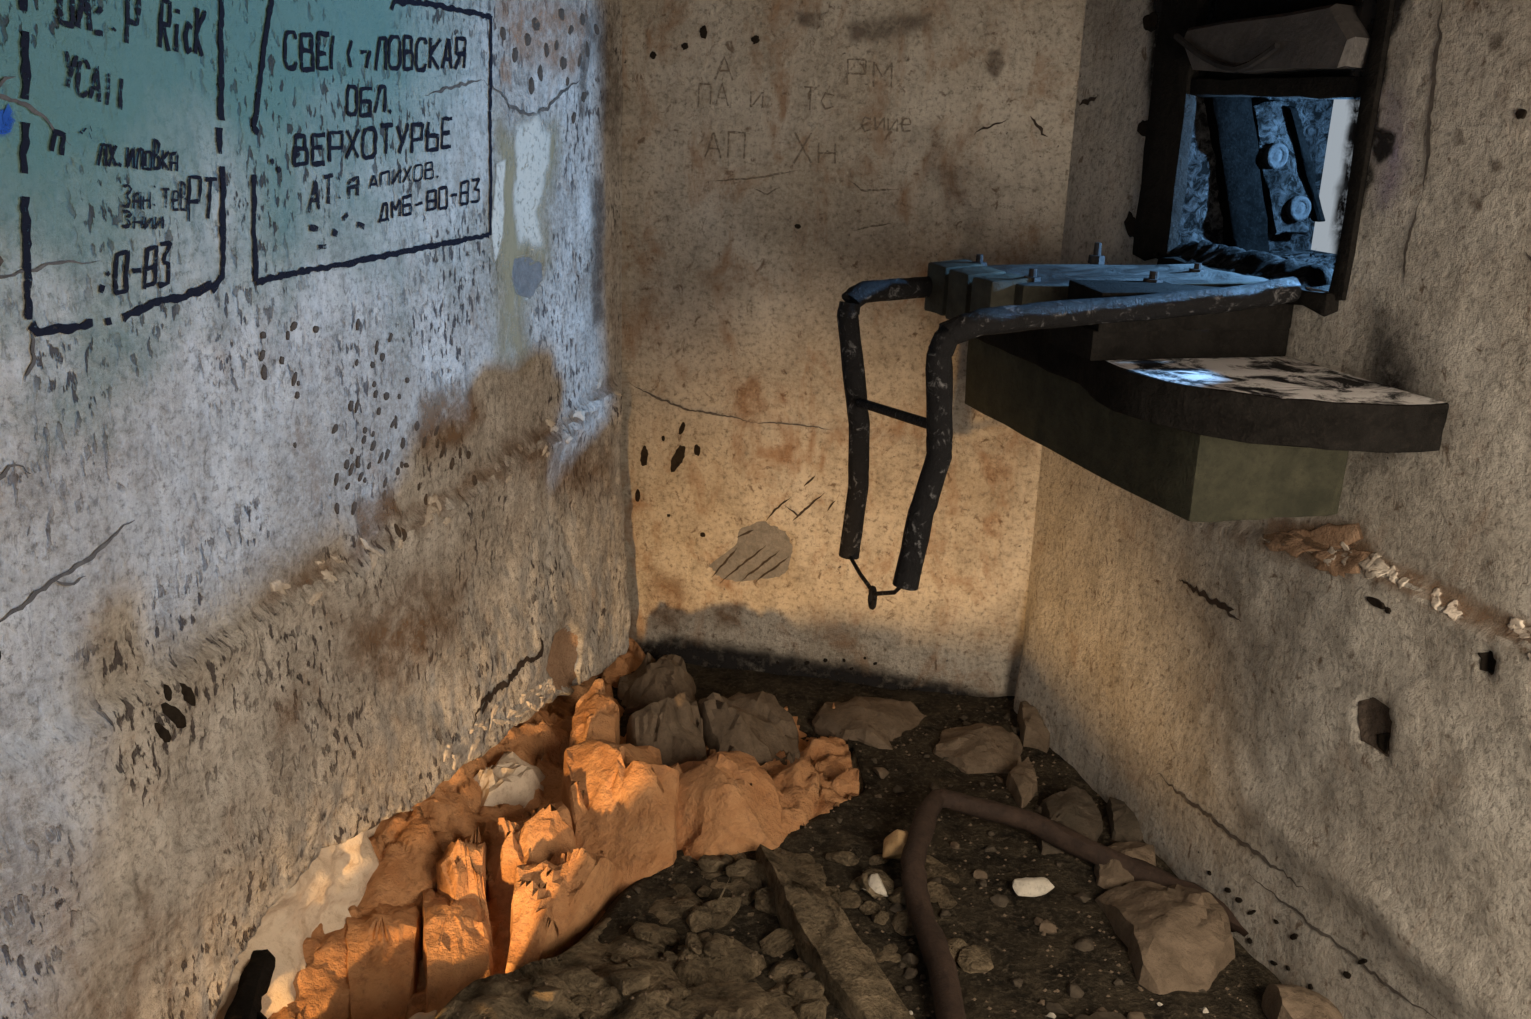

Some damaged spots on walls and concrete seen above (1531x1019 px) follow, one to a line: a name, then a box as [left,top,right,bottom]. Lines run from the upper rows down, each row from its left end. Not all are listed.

crack [1403,0,1443,283]
crack [25,331,37,381]
crack [0,464,31,480]
crack [0,520,135,622]
crack [1179,580,1241,622]
peeling [1262,518,1531,661]
spalling [1358,697,1392,757]
crack [1156,773,1437,1019]